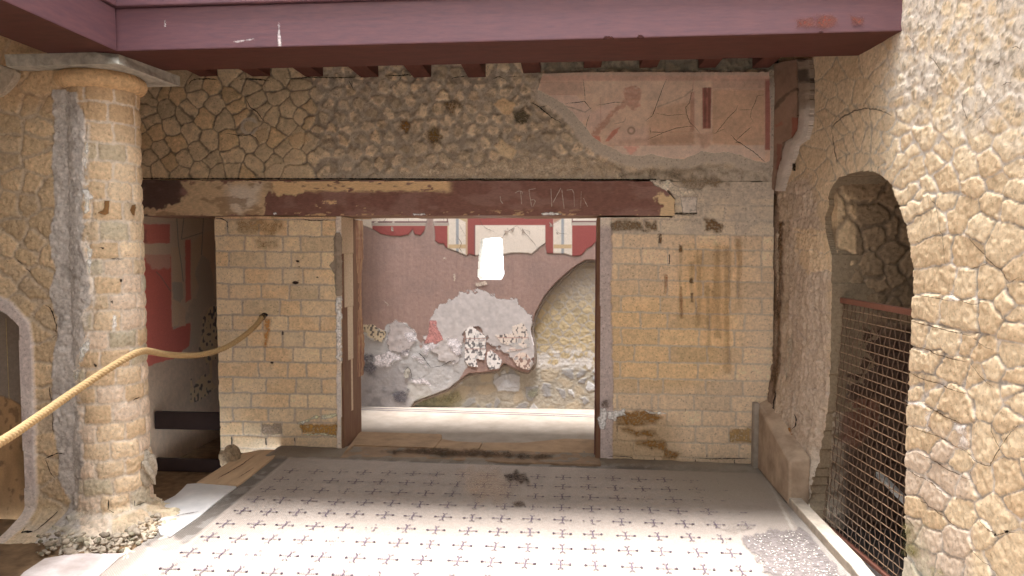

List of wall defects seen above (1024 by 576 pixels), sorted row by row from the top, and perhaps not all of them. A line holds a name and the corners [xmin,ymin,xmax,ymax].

crack [648,79,765,162]
crack [831,107,890,165]
spalling [387,288,535,370]
leakage [598,408,678,459]